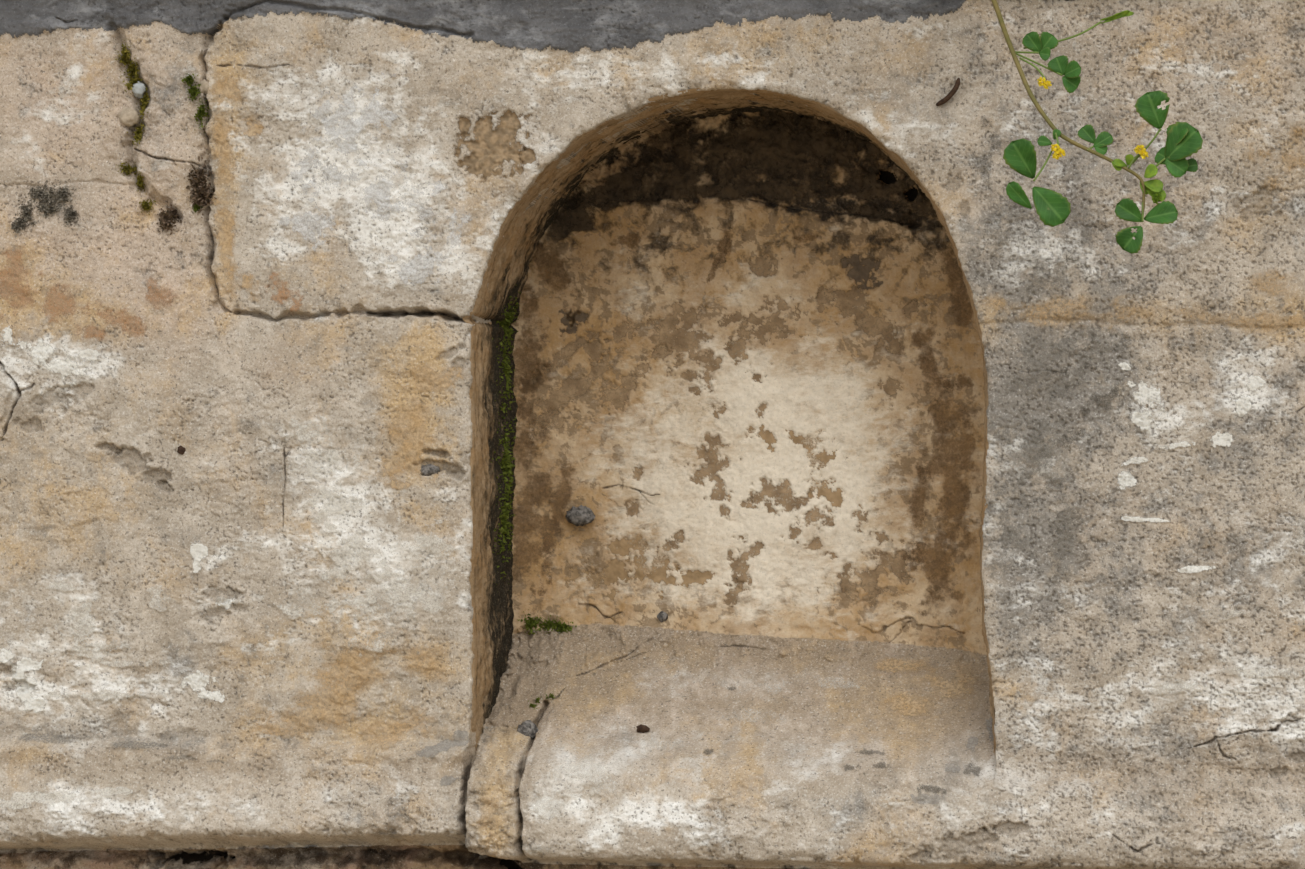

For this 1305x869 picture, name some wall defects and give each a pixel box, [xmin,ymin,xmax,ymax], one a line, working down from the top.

spalling [454,110,536,183]
damp [846,201,922,227]
damp [708,227,733,280]
peeling [748,254,782,277]
peeling [816,254,927,355]
peeling [520,296,803,437]
peeling [878,377,901,396]
peeling [624,500,639,516]
peeling [688,403,912,607]
peeling [565,530,764,607]
crack [517,651,646,849]